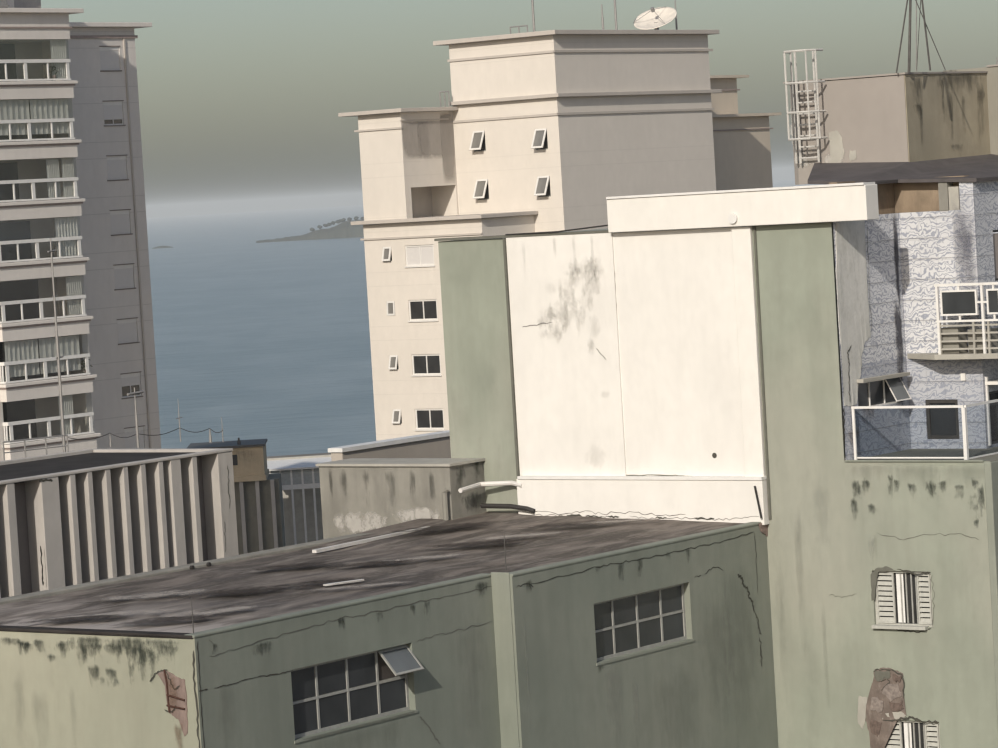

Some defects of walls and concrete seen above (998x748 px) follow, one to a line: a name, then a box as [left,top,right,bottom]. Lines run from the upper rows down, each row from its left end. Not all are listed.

leakage [402,114,455,177]
leakage [27,606,251,624]
leakage [335,513,385,533]
leakage [109,519,636,600]
leakage [395,508,487,532]
crack [516,511,763,666]
crack [878,532,979,540]
leakage [111,639,152,664]
crack [192,586,492,748]
spalling [149,669,188,736]
spalling [857,667,937,748]